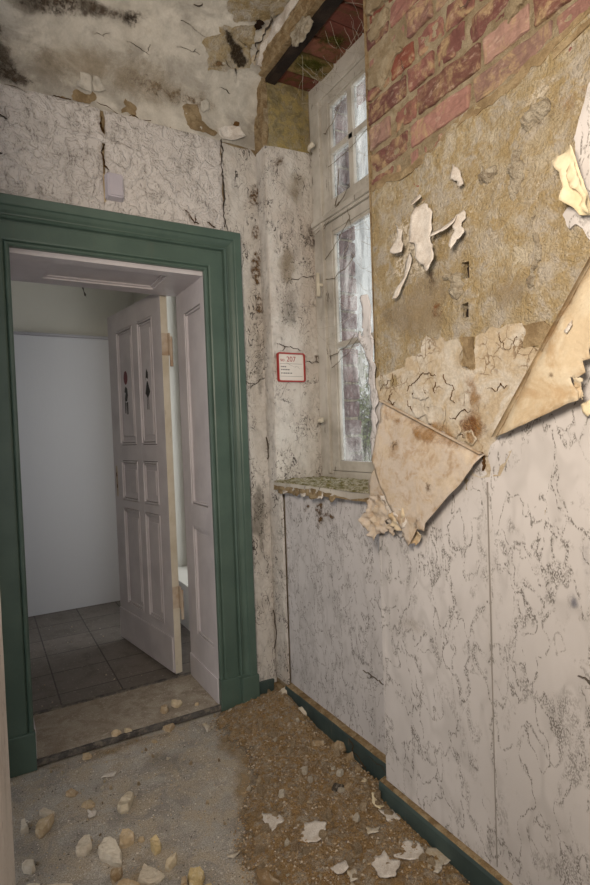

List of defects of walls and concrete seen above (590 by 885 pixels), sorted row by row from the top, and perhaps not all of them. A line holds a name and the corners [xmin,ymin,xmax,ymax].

leakage [20,0,137,24]
leakage [0,44,26,84]
flaking render [72,72,106,104]
crack [219,139,227,227]
flaking render [182,0,590,490]
leakage [251,253,261,285]